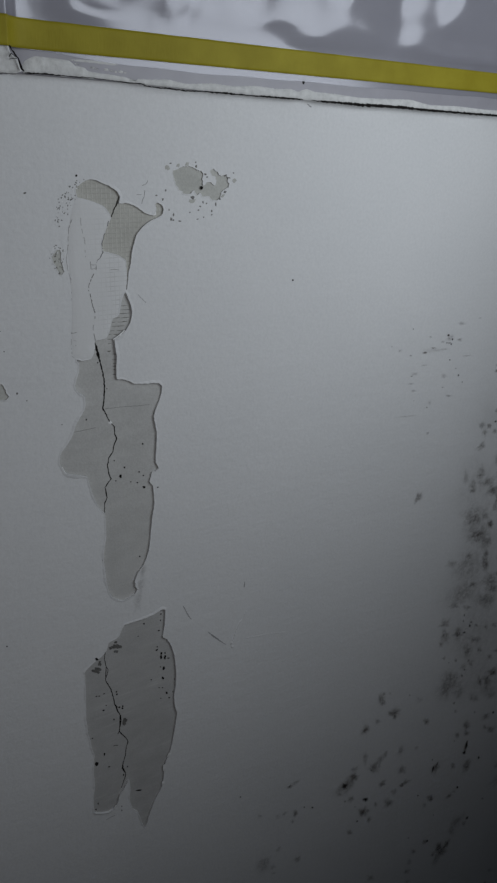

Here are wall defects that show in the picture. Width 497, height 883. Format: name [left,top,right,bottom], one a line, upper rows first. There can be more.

crack [0,45,497,117]
crack [66,181,150,513]
peeling [58,162,237,602]
crack [104,652,128,788]
peeling [83,606,179,828]